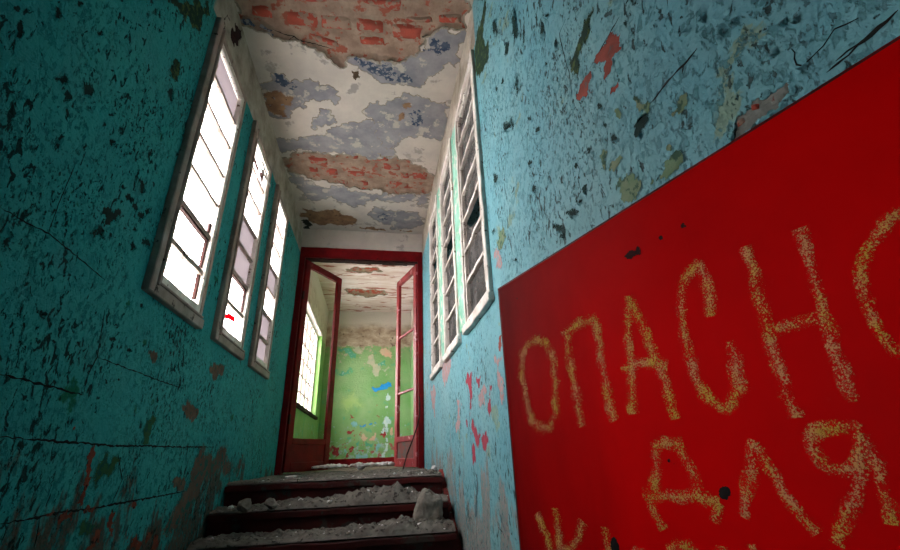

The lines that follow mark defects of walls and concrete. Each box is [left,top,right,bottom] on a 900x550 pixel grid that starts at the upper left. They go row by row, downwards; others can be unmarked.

peeling [569,7,627,112]
crack [792,10,898,72]
flaking render [234,0,525,230]
peeling [633,94,650,141]
flaking render [730,77,797,141]
crack [3,166,105,280]
flaking render [344,288,388,298]
crack [0,312,181,395]
peeling [338,346,393,392]
peeling [332,405,393,459]
crack [0,436,208,548]
peeling [162,444,243,539]